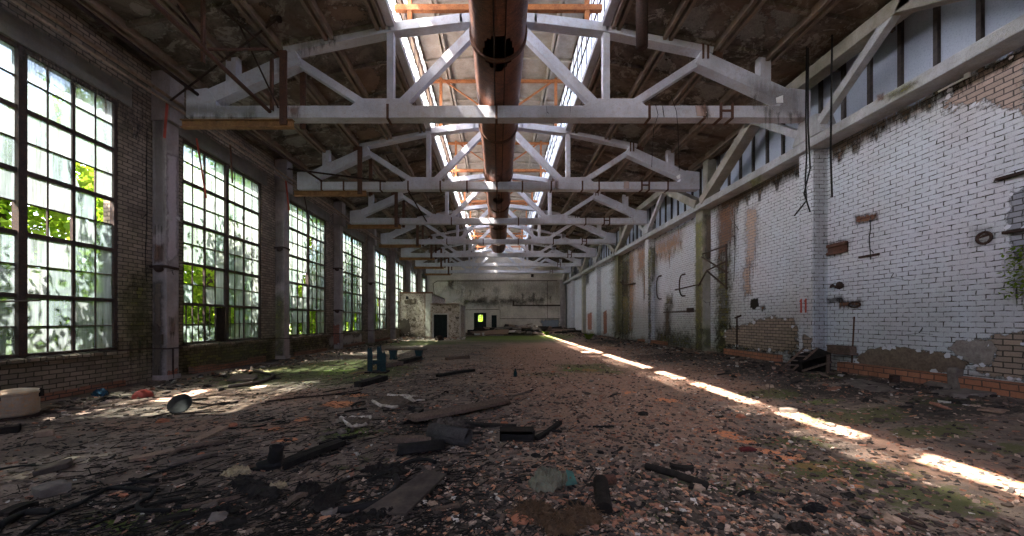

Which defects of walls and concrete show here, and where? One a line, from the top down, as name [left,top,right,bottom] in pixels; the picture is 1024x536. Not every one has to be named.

water stain [832,45,1024,162]
peeling [942,52,1024,116]
rust [716,200,756,294]
peeling [723,298,812,354]
spalling [853,331,1024,381]